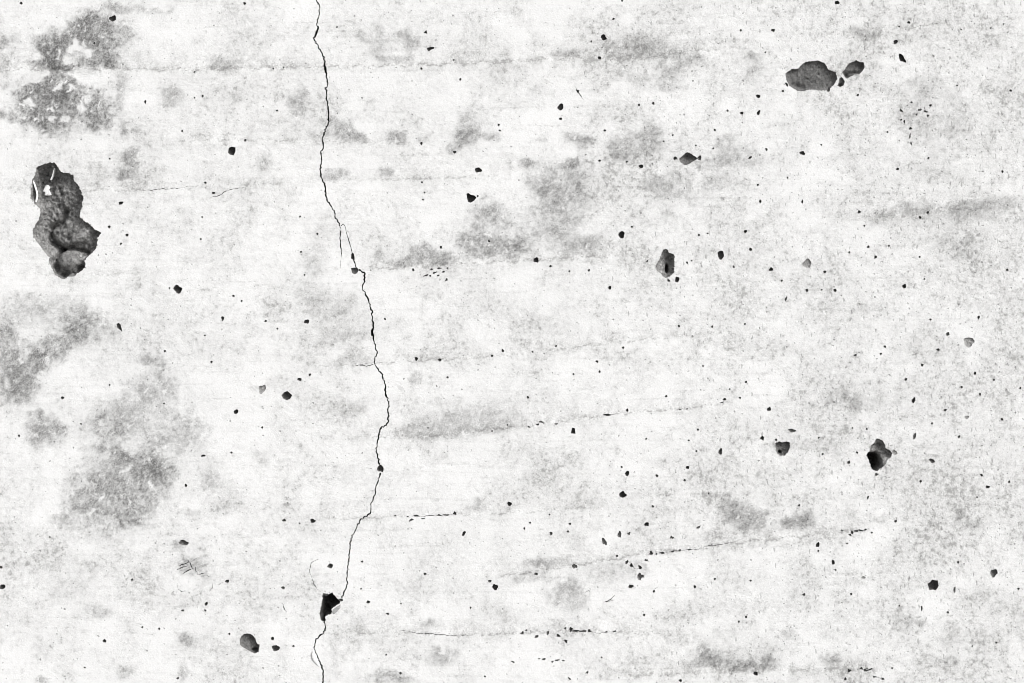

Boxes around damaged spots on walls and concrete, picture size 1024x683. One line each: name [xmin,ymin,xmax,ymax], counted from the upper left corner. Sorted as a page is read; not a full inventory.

spalling [785,60,865,92]
spalling [30,162,101,279]
spalling [655,249,679,282]
crack [313,0,394,598]
spalling [866,439,897,476]
spalling [319,593,343,622]
spalling [240,634,280,653]
crack [311,622,326,683]